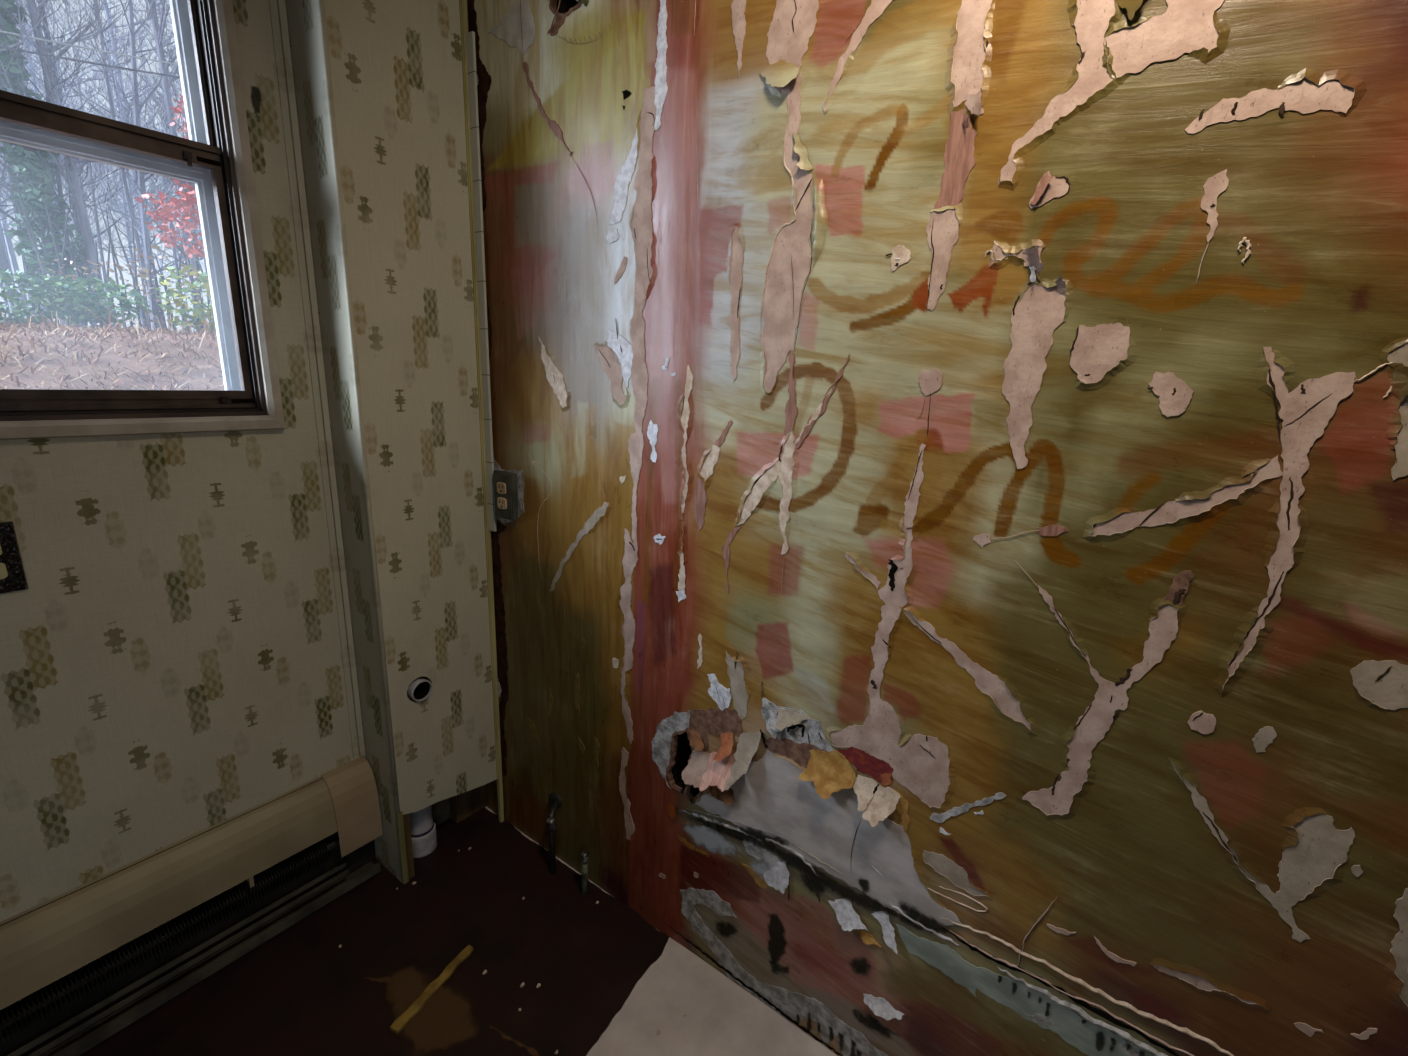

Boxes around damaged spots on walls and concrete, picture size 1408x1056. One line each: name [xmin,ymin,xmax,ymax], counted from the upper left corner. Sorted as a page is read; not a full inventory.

peeling [926,0,997,311]
peeling [997,0,1231,191]
peeling [1185,68,1367,134]
peeling [550,0,668,841]
spalling [651,634,810,806]
peeling [722,0,849,594]
peeling [798,369,1038,834]
peeling [985,238,1137,469]
peeling [1019,565,1195,820]
peeling [973,337,1408,698]
spalling [680,872,897,1056]
peeling [1168,757,1363,943]